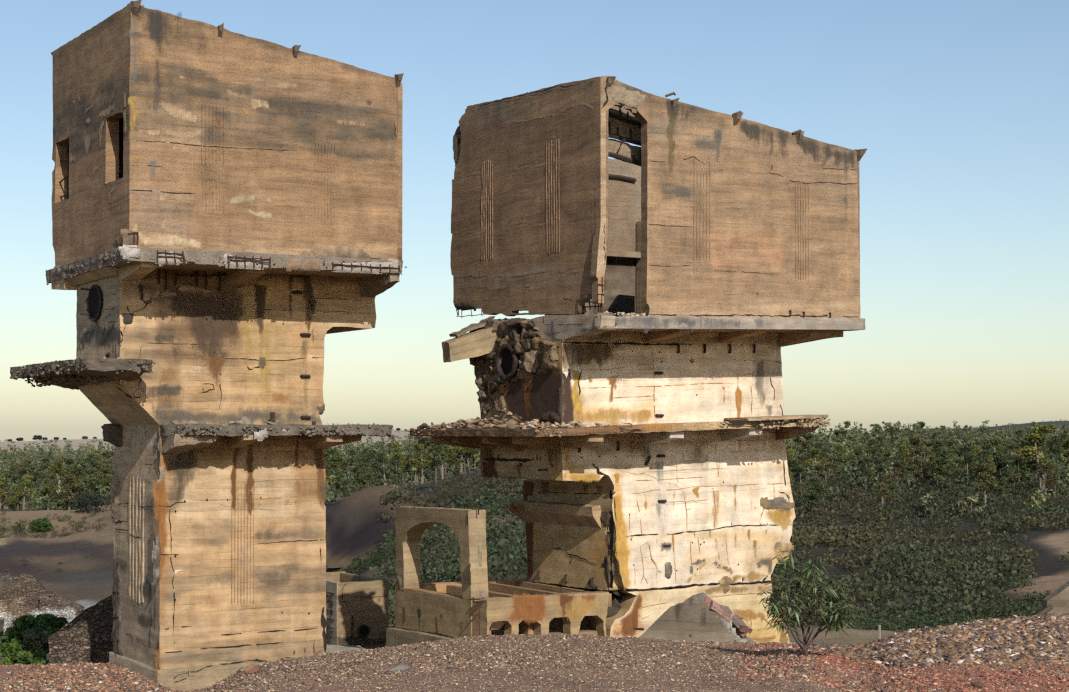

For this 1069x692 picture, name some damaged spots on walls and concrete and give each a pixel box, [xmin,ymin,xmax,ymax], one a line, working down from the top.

water stain [149,11,179,43]
water stain [800,140,854,164]
spalling [46,220,407,304]
spalling [122,313,134,325]
water stain [172,283,266,356]
spalling [454,267,583,414]
crack [647,304,856,317]
spalling [10,352,156,387]
crack [483,298,811,639]
corrosion [614,495,630,588]
corrosion [513,593,545,622]
corrosion [622,595,642,637]